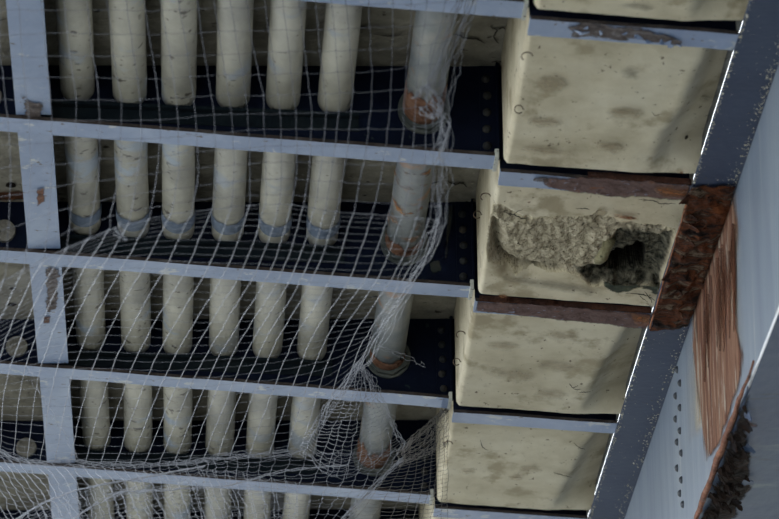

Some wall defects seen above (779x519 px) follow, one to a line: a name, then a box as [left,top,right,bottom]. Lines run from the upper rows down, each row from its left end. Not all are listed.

peeling [569,22,683,48]
corrosion [403,79,448,125]
spalling [485,202,676,291]
corrosion [476,172,757,519]